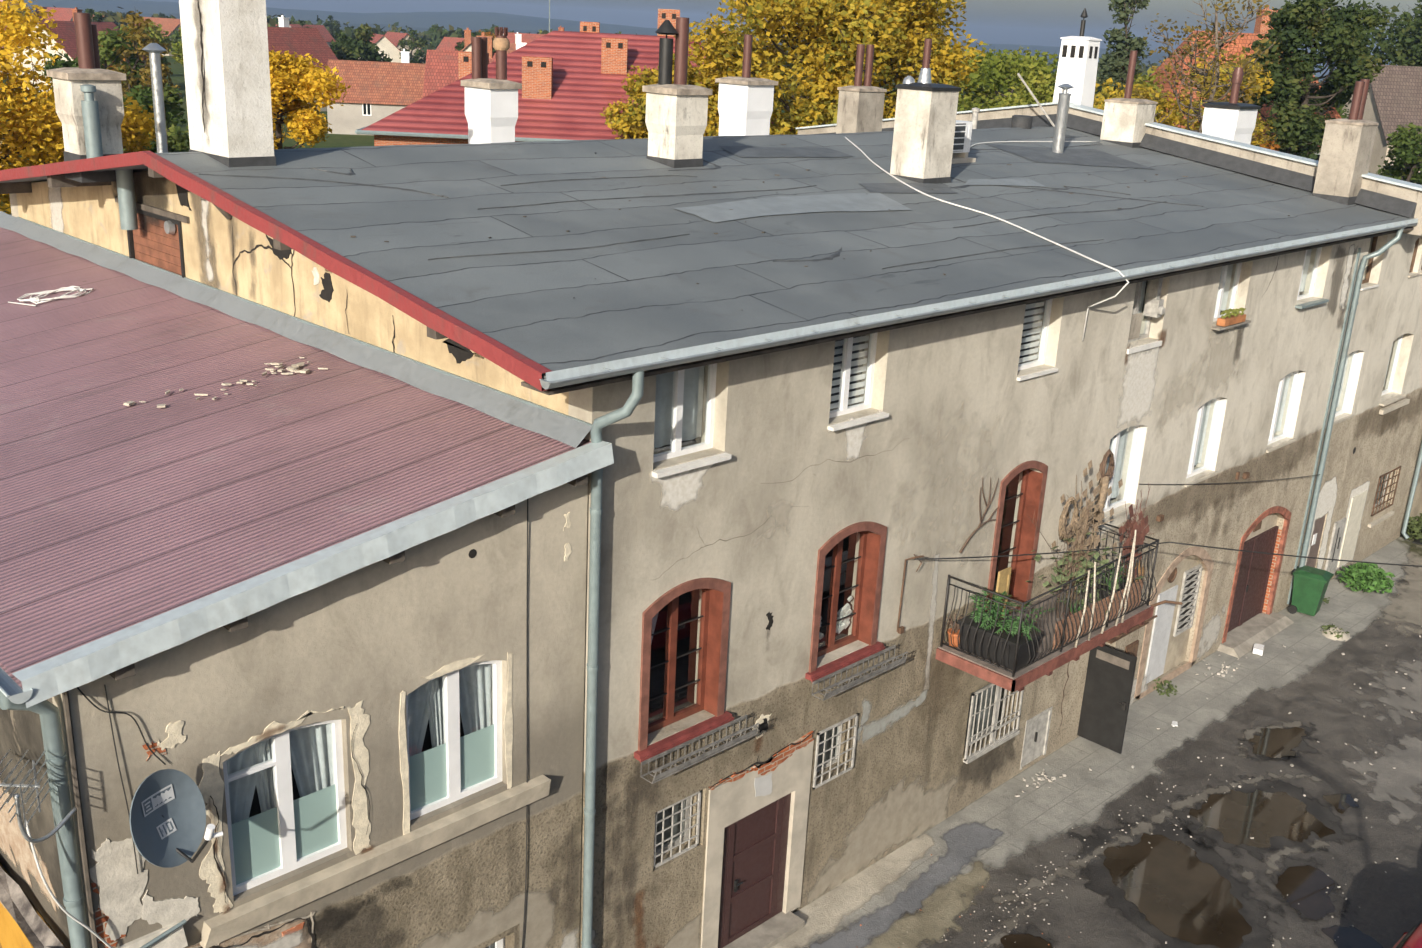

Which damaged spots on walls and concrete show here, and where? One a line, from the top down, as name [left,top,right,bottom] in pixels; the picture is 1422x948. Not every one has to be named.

crack [197,1,207,133]
spalling [175,184,192,211]
crack [232,226,295,316]
spalling [266,235,292,260]
spalling [312,267,334,302]
spalling [443,338,477,363]
peeling [421,654,485,679]
water stain [856,690,927,741]
peeling [399,691,410,835]
flaking render [90,700,371,948]
crack [199,918,315,948]
water stain [321,899,398,948]